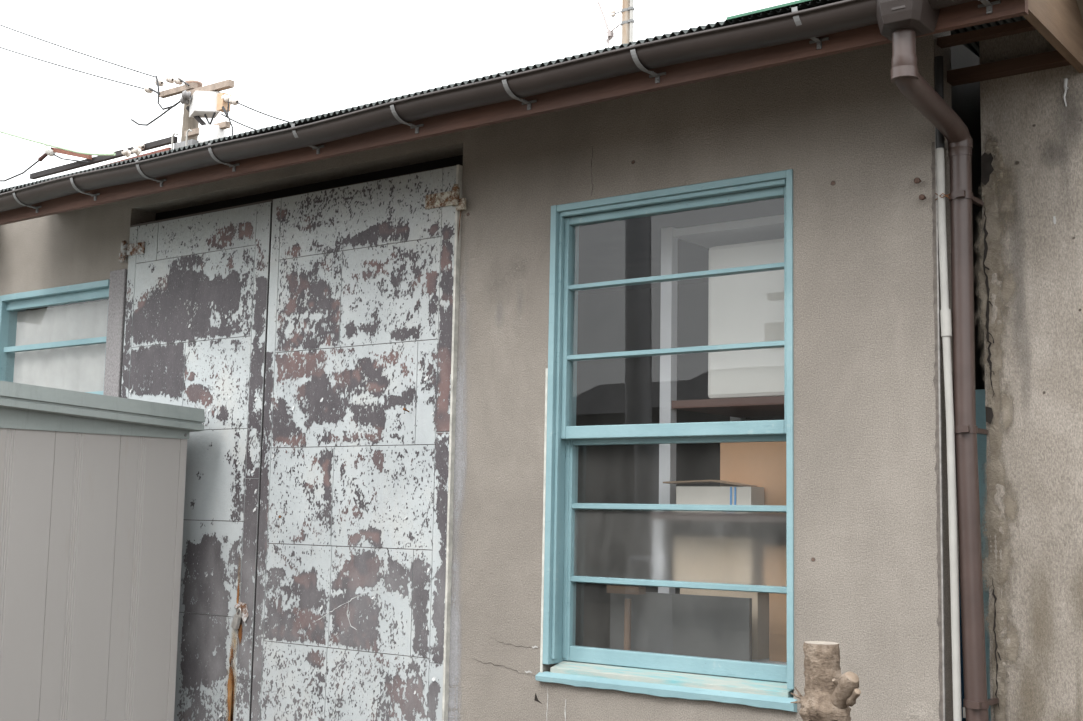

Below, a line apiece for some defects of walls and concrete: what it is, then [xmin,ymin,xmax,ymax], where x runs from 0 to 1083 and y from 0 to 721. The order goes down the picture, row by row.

peeling [121,173,469,721]
rust [227,622,242,721]
crack [475,640,538,676]